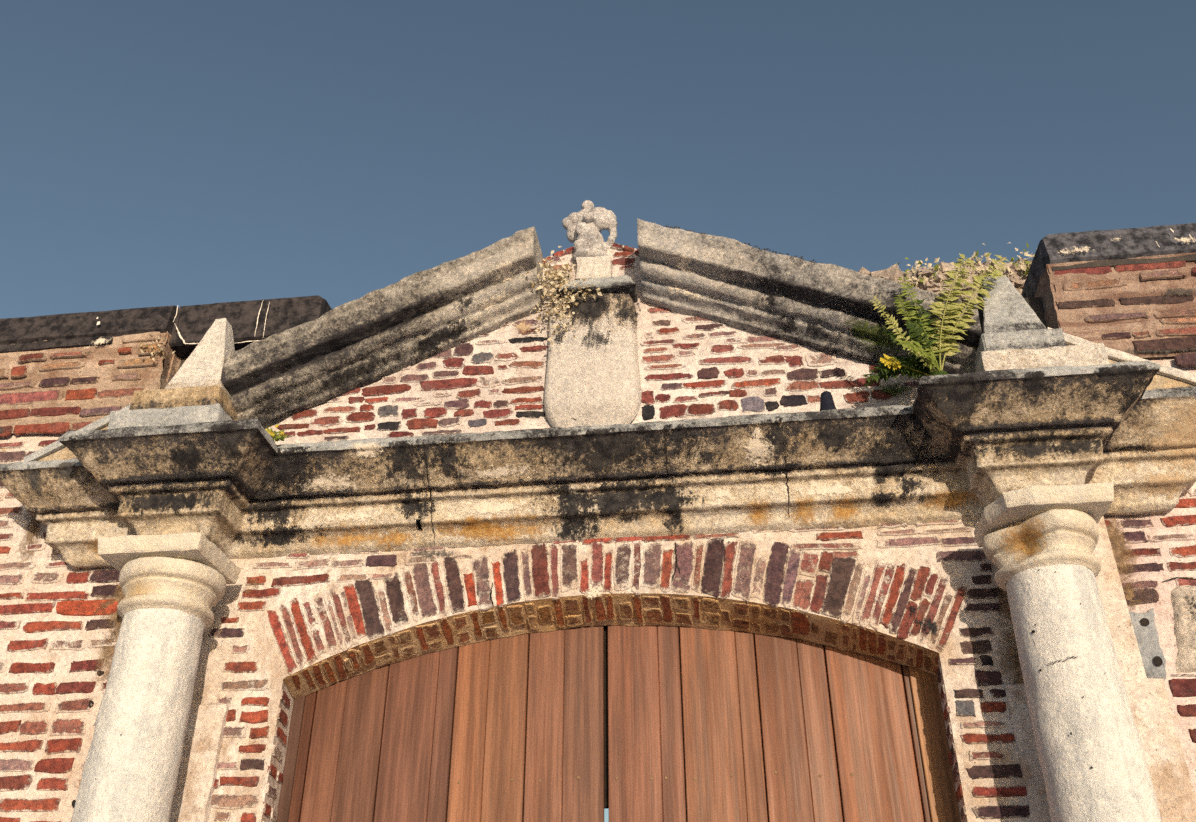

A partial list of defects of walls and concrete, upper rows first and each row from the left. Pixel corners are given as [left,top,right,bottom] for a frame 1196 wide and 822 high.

water stain [24,466,42,498]
water stain [56,434,94,481]
water stain [120,424,249,521]
water stain [235,292,492,414]
water stain [233,422,732,548]
water stain [753,278,853,341]
water stain [748,408,938,507]
water stain [927,371,1102,459]
water stain [1068,348,1196,414]